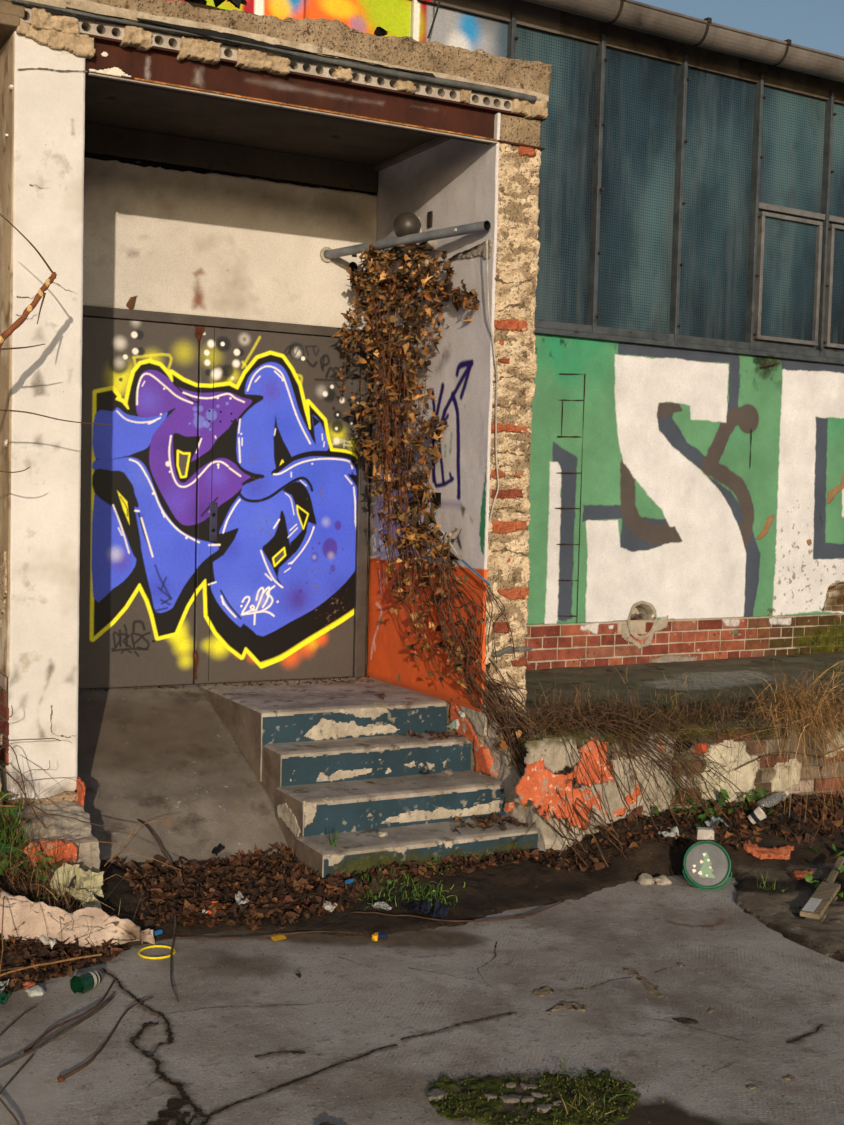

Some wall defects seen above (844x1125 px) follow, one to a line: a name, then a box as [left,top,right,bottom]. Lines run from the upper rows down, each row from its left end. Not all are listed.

spalling [89,67,131,77]
rust [135,58,199,89]
flaking render [519,143,537,157]
flaking render [494,319,528,364]
peeling [827,472,844,504]
spalling [825,582,844,614]
peeling [304,707,447,782]
peeling [824,729,844,759]
peeling [367,702,802,856]
spalling [277,799,335,839]
spalling [327,854,345,866]
crack [102,968,517,1125]